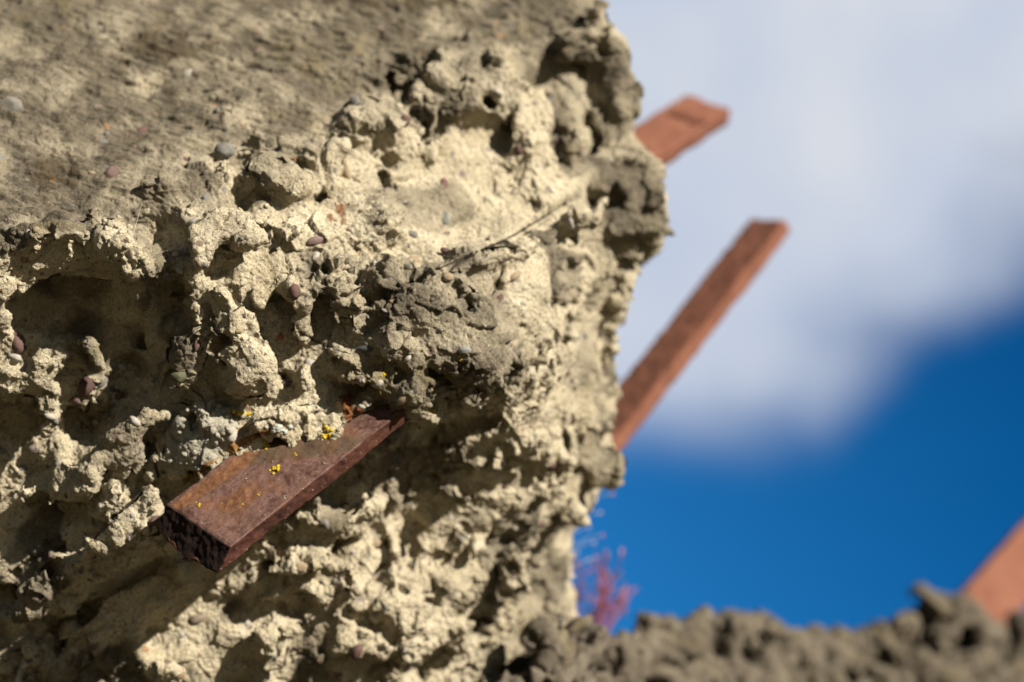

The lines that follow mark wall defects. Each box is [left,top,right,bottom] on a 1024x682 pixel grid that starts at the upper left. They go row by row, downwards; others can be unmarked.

spalling [380,64,458,145]
spalling [536,78,578,166]
spalling [233,148,275,216]
spalling [16,197,258,437]
spalling [0,406,47,489]
rust [184,460,214,482]
spalling [164,402,243,475]
rust [228,427,273,455]
spalling [442,397,506,441]
spalling [154,576,253,645]